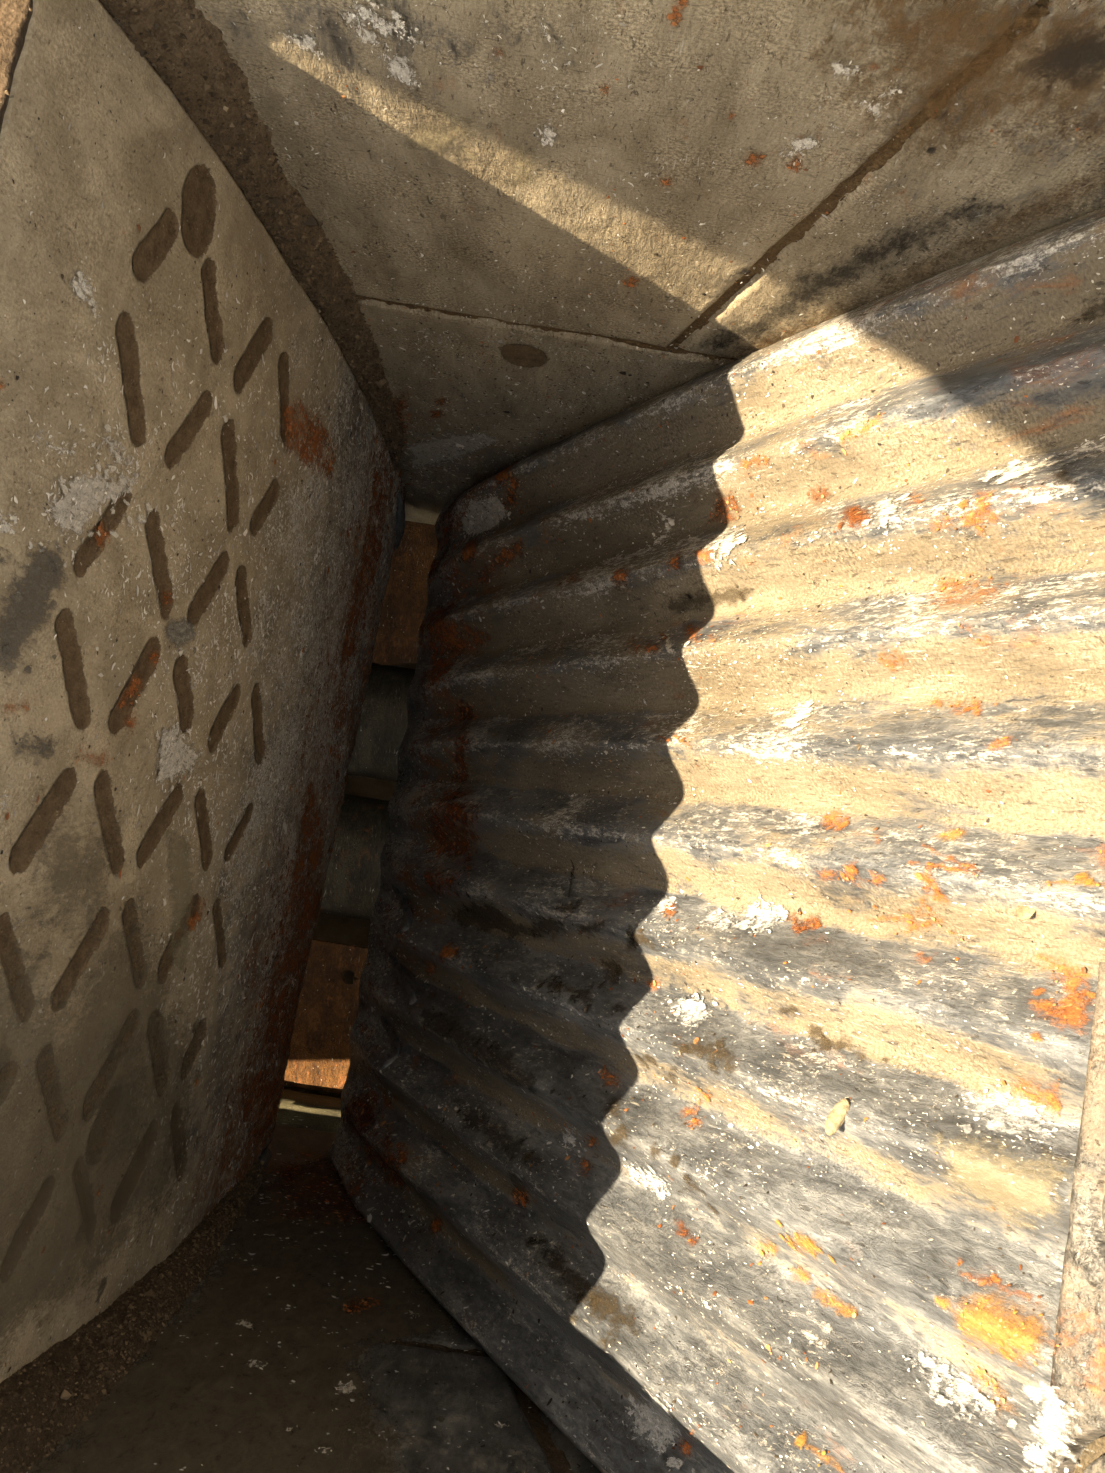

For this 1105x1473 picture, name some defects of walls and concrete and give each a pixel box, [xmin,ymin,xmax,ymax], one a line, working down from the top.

corrosion [195,395,412,1208]
corrosion [821,862,884,886]
corrosion [873,828,978,961]
corrosion [1029,956,1095,1042]
corrosion [935,1261,1059,1408]